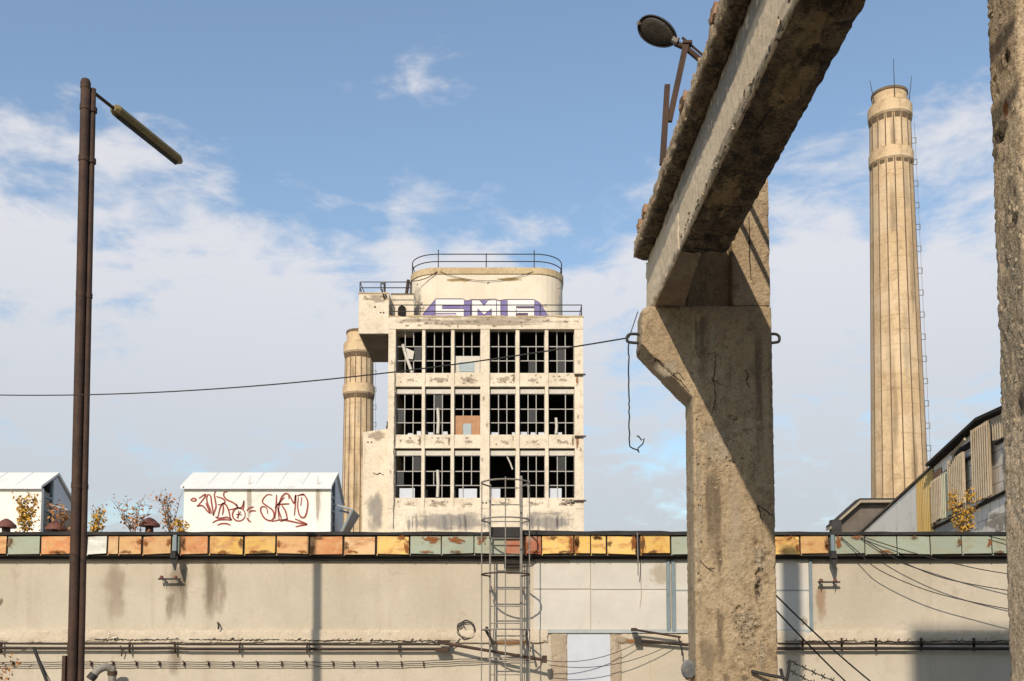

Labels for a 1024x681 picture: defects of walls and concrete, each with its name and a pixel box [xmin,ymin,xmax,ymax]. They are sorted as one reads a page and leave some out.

spalling [679,0,790,238]
crack [708,352,721,410]
leakage [407,514,489,530]
leakage [526,512,566,530]
rust [397,536,487,553]
rust [559,536,579,555]
rust [631,535,646,555]